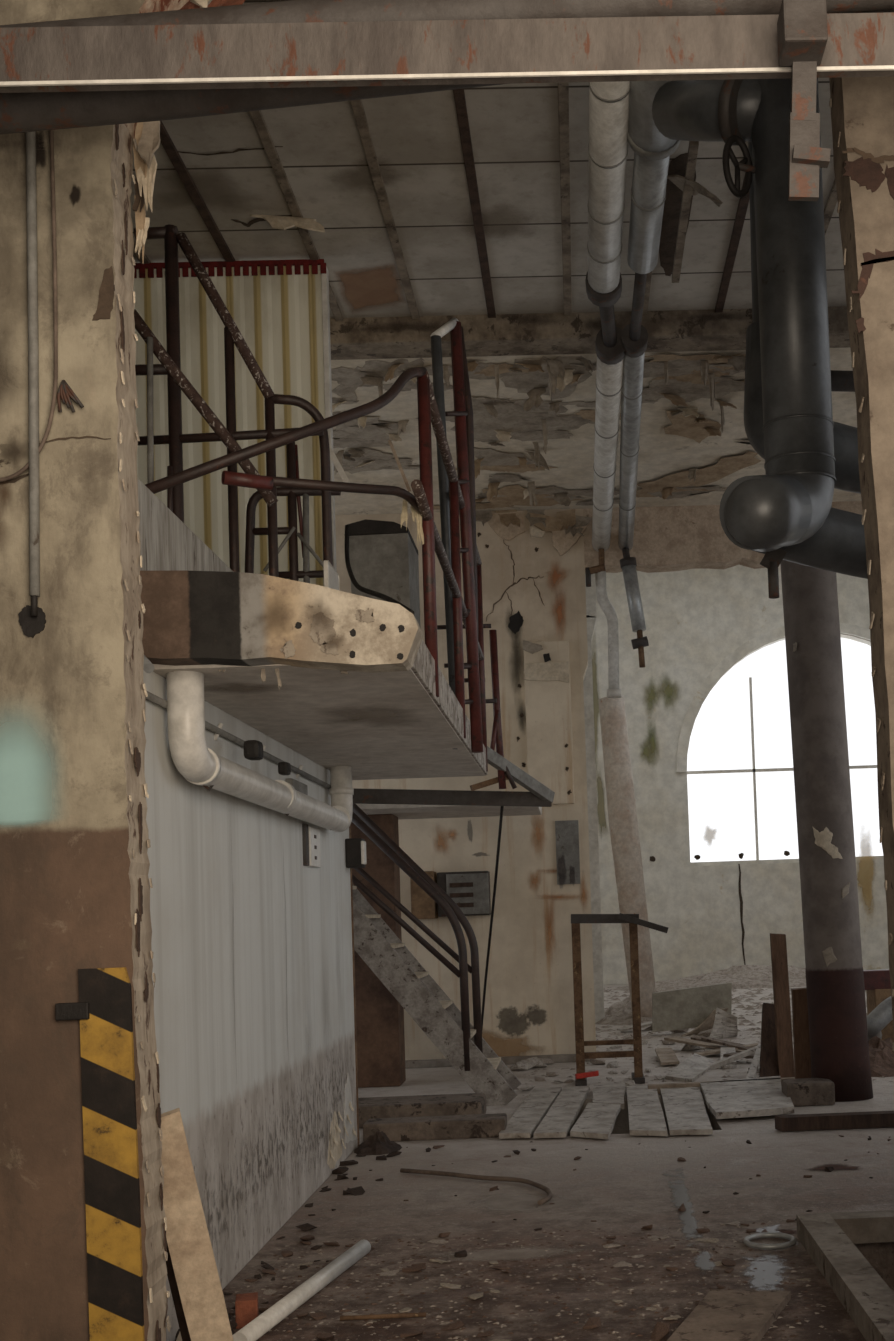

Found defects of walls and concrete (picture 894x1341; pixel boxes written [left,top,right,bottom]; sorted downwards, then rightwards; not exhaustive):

peeling [92,121,160,408]
peeling [642,366,745,444]
peeling [331,356,596,556]
peeling [636,440,761,499]
crack [486,540,545,621]
peeling [127,604,145,662]
peeling [128,683,151,858]
peeling [812,826,843,859]
peeling [134,878,156,1022]
peeling [140,1041,163,1141]
peeling [146,1159,168,1261]
peeling [156,1316,171,1341]